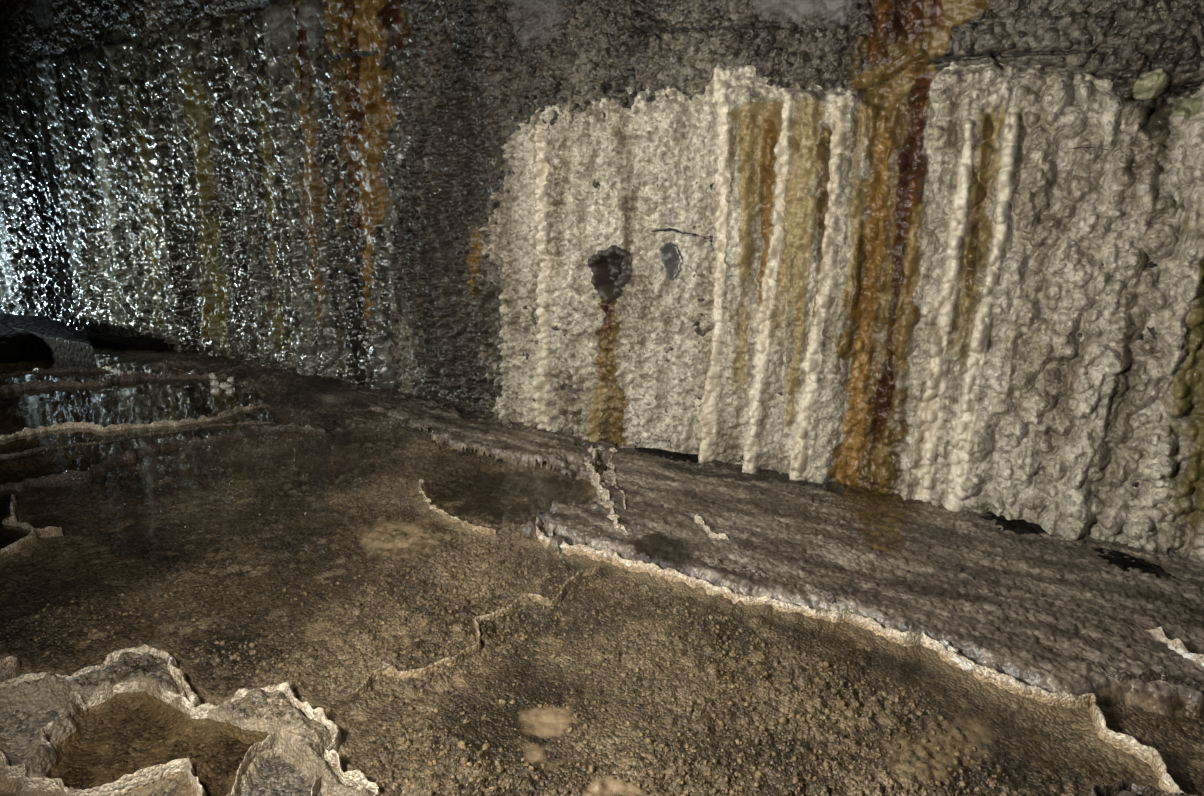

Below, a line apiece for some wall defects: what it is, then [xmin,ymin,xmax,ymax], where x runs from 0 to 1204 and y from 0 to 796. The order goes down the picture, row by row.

rust [286,0,409,338]
rust [586,298,629,447]
spalling [587,245,633,304]
rust [729,98,832,425]
rust [828,0,992,494]
rust [955,109,1006,355]